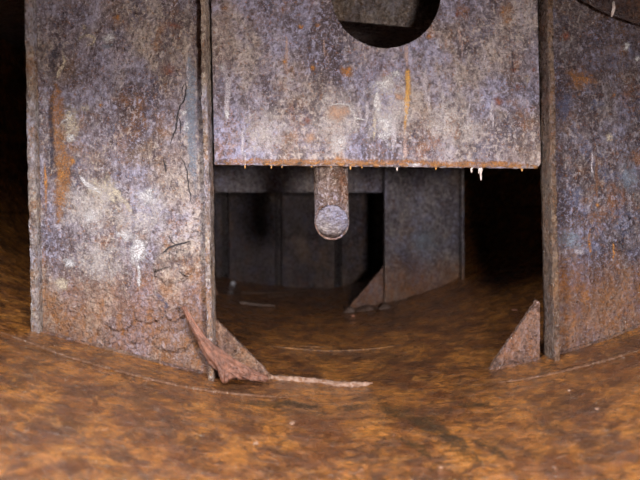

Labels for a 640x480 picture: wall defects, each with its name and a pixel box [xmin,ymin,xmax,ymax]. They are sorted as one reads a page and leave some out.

corrosion [44,84,75,224]
crack [170,83,191,201]
crack [161,237,190,254]